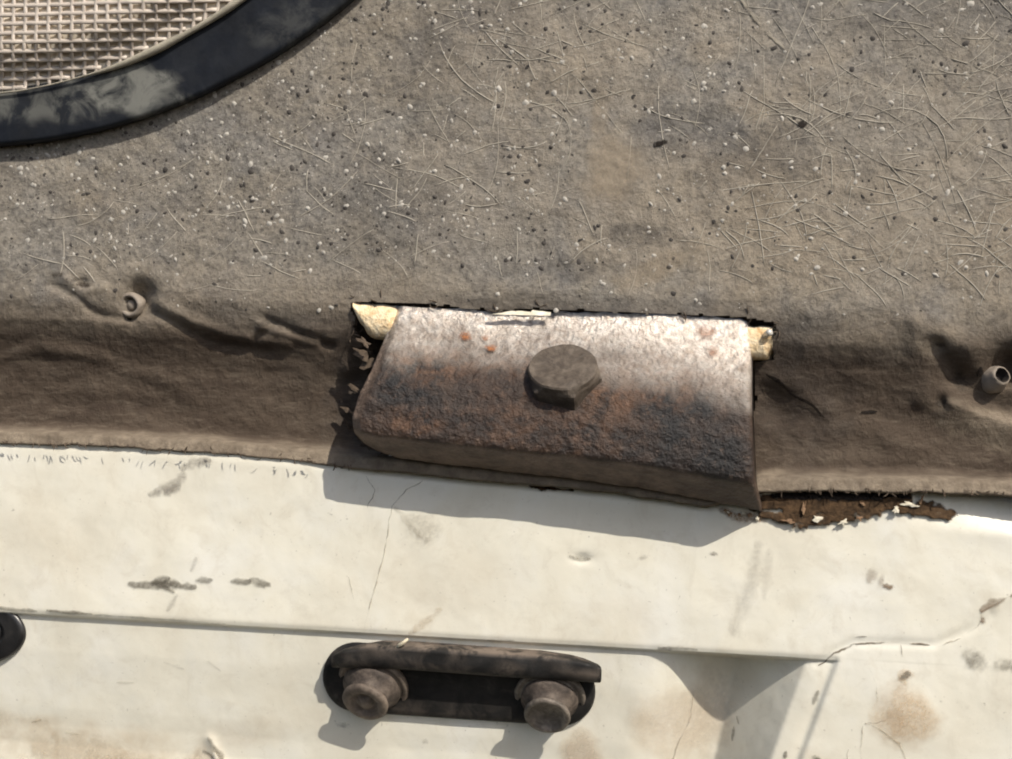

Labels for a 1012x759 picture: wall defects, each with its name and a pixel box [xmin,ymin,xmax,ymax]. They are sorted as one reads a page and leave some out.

rust [723,492,957,529]
crack [818,636,958,666]